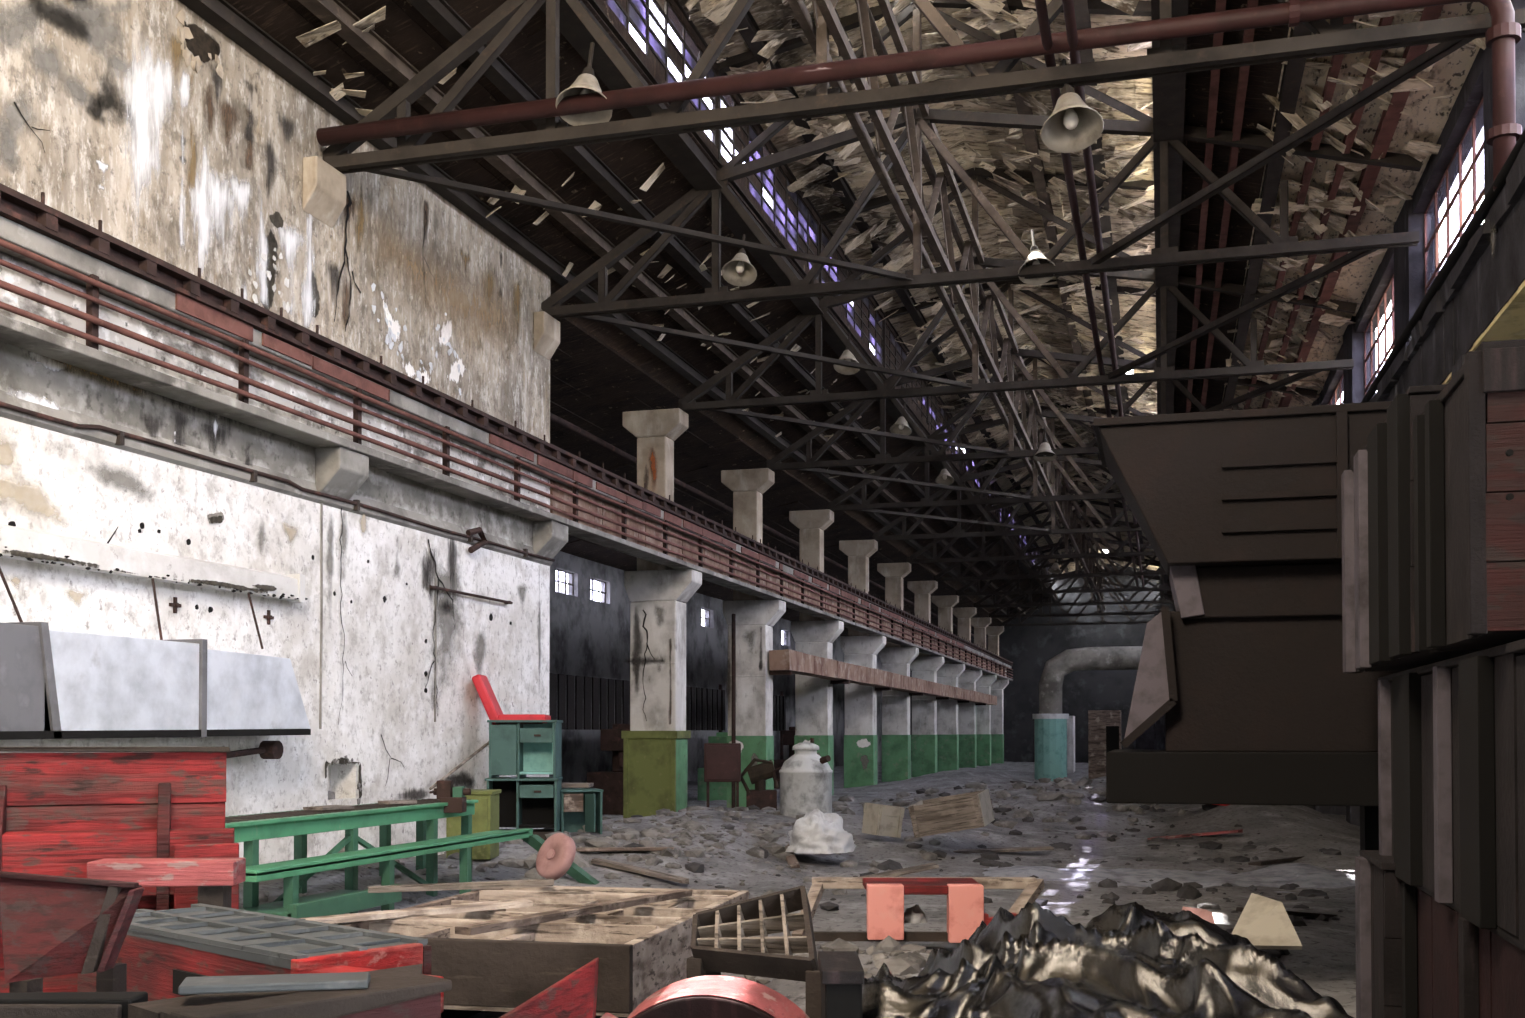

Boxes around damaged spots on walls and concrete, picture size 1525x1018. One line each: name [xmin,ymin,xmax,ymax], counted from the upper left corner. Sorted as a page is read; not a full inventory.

water stain [0,0,350,325]
water stain [344,186,364,244]
peeling [371,283,467,395]
water stain [426,539,457,591]